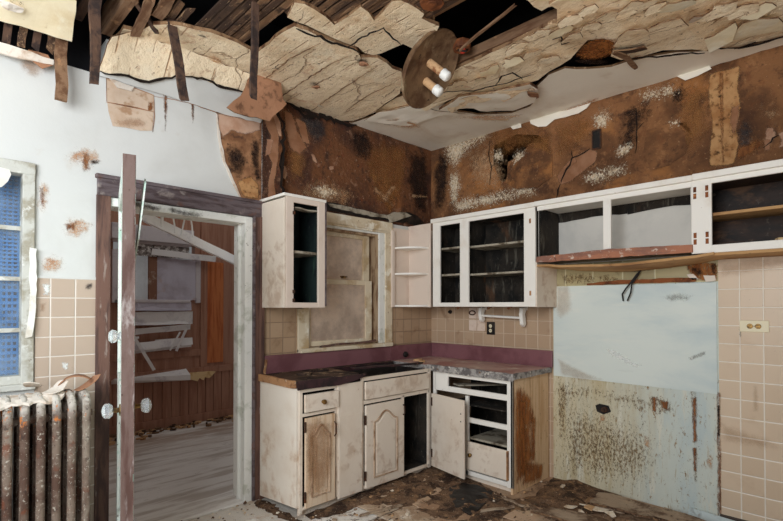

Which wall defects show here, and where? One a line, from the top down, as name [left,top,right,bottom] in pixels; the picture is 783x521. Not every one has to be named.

flaking render [106,78,154,131]
spalling [216,111,317,200]
water stain [312,185,348,201]
crack [263,27,401,193]
water stain [353,132,549,212]
crack [443,72,530,93]
peeling [511,102,591,129]
crack [556,149,589,198]
water stain [585,83,702,186]
peeling [677,66,711,80]
rust [649,397,671,414]
water stain [558,385,653,482]